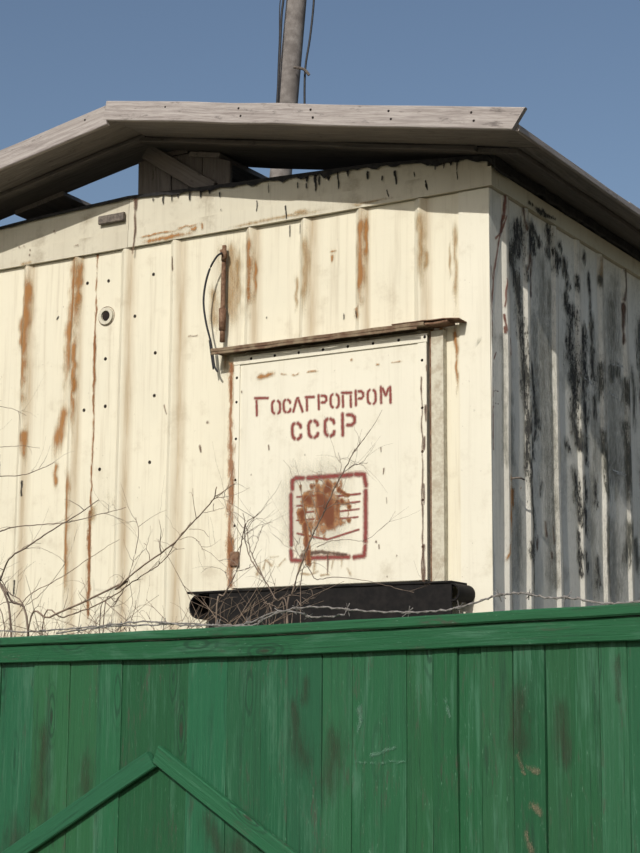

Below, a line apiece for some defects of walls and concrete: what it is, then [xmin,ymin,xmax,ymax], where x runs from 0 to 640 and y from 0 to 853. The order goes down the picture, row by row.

rust [226,238,258,316]
rust [295,242,308,301]
rust [355,218,368,317]
rust [416,217,428,266]
rust [19,430,28,457]
rust [19,280,33,403]
rust [54,258,83,451]
rust [223,356,242,587]
leakage [508,200,640,590]
rust [53,464,71,588]
rust [297,479,351,573]